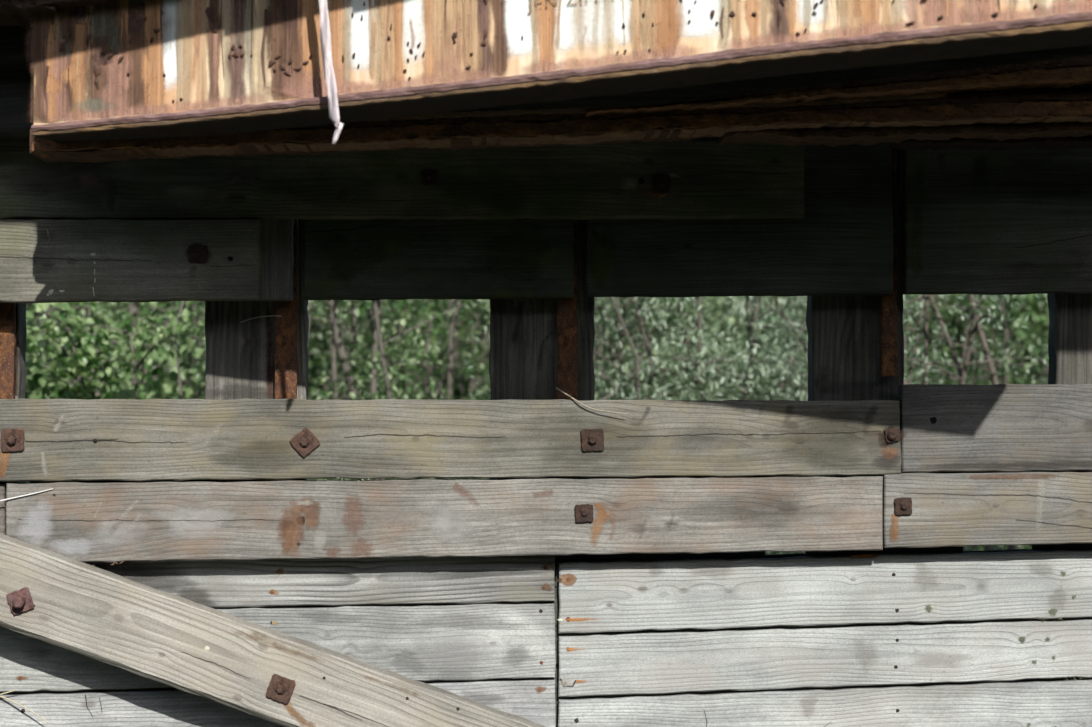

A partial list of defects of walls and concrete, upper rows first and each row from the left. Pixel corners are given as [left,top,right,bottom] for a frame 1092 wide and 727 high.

corrosion [280,500,318,552]